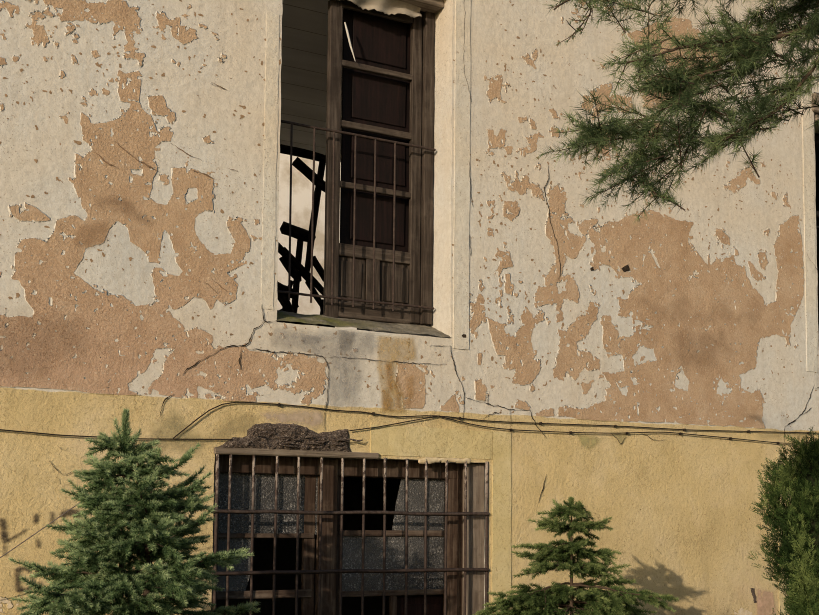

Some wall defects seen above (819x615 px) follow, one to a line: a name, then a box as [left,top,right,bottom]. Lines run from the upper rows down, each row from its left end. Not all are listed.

peeling [0,0,338,406]
crack [183,309,546,437]
peeling [354,338,495,413]
peeling [462,9,805,430]